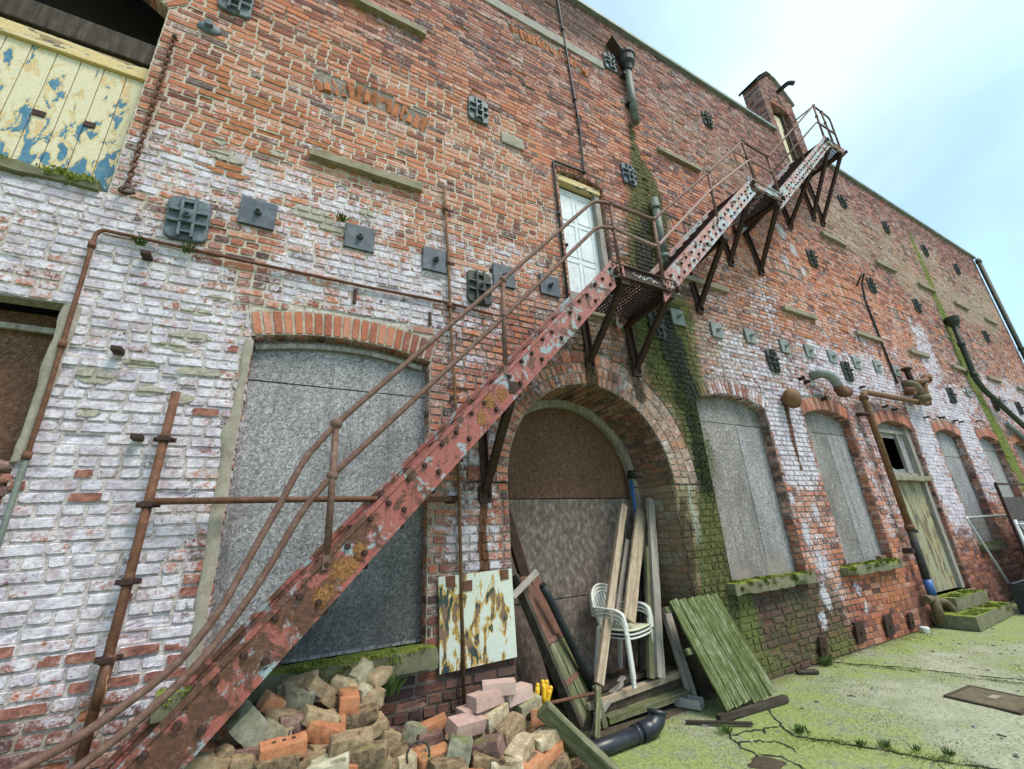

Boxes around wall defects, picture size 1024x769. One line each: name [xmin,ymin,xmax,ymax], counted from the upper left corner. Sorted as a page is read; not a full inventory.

damp [625,125,669,272]
damp [581,331,598,388]
damp [626,305,715,498]
corrosion [313,542,368,609]
corrosion [446,503,561,639]
damp [679,498,700,597]
damp [722,542,739,617]
crack [728,709,998,769]